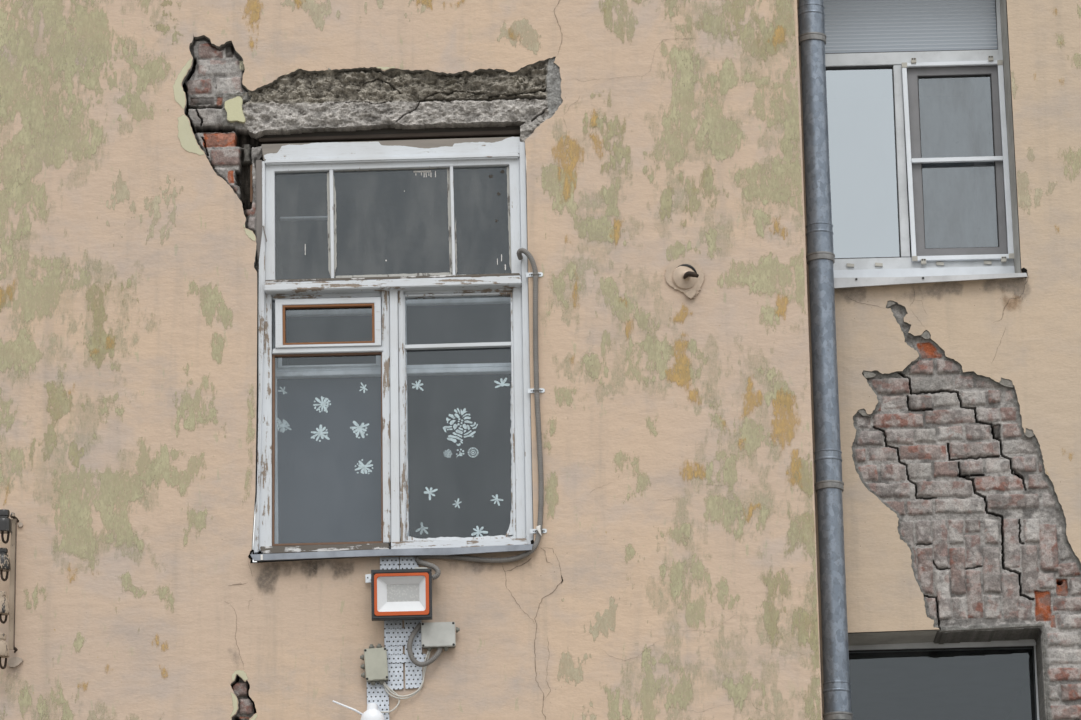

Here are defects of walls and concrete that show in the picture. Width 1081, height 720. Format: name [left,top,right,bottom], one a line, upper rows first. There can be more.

peeling [497,19,541,55]
spalling [230,670,258,720]
peeling [542,0,822,720]
spalling [852,301,1081,720]